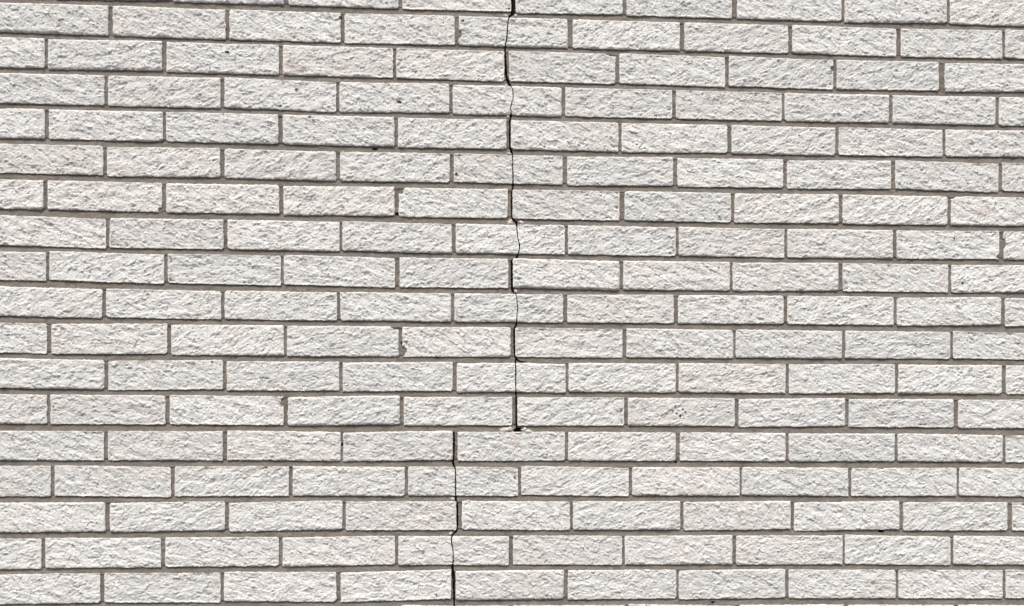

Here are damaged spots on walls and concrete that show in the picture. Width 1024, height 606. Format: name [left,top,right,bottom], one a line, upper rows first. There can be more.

crack [504,0,525,432]
crack [449,432,471,606]